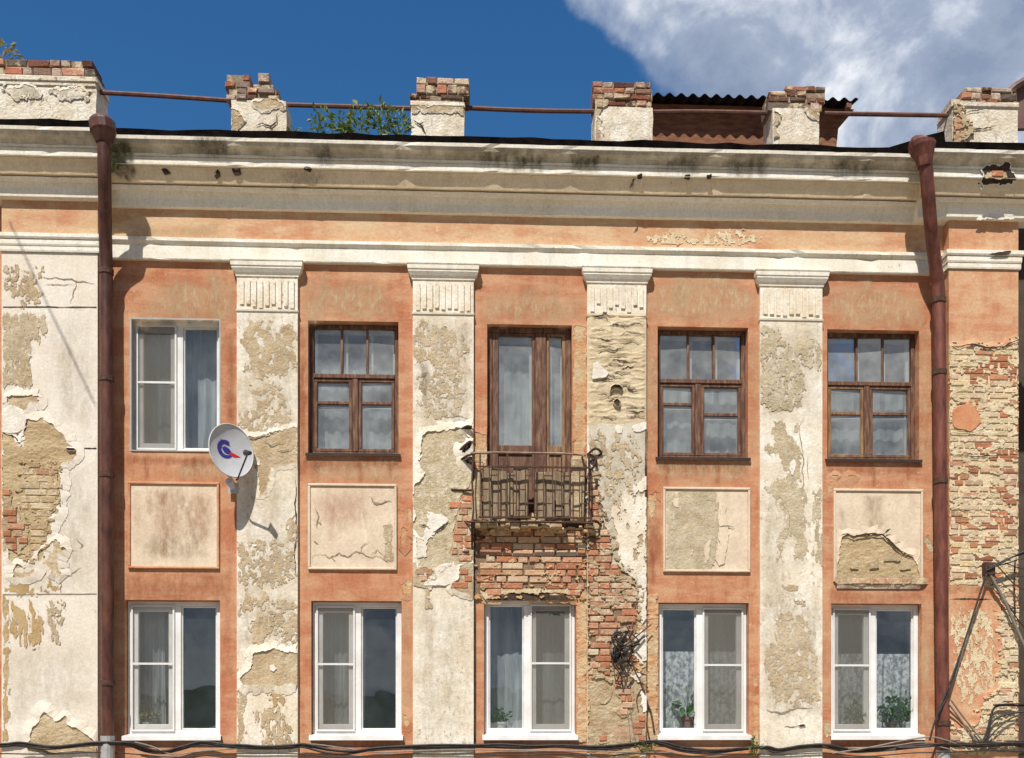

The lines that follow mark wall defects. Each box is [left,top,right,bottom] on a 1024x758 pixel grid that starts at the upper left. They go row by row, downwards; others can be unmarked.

peeling [646,228,762,245]
flaking render [976,161,1017,189]
flaking render [1,264,97,758]
flaking render [237,517,297,745]
flaking render [237,320,298,499]
crack [291,481,392,576]
flaking render [383,318,729,758]
peeling [751,585,821,745]
peeling [760,325,861,566]
flaking render [834,524,934,589]
flaking render [948,333,1019,758]